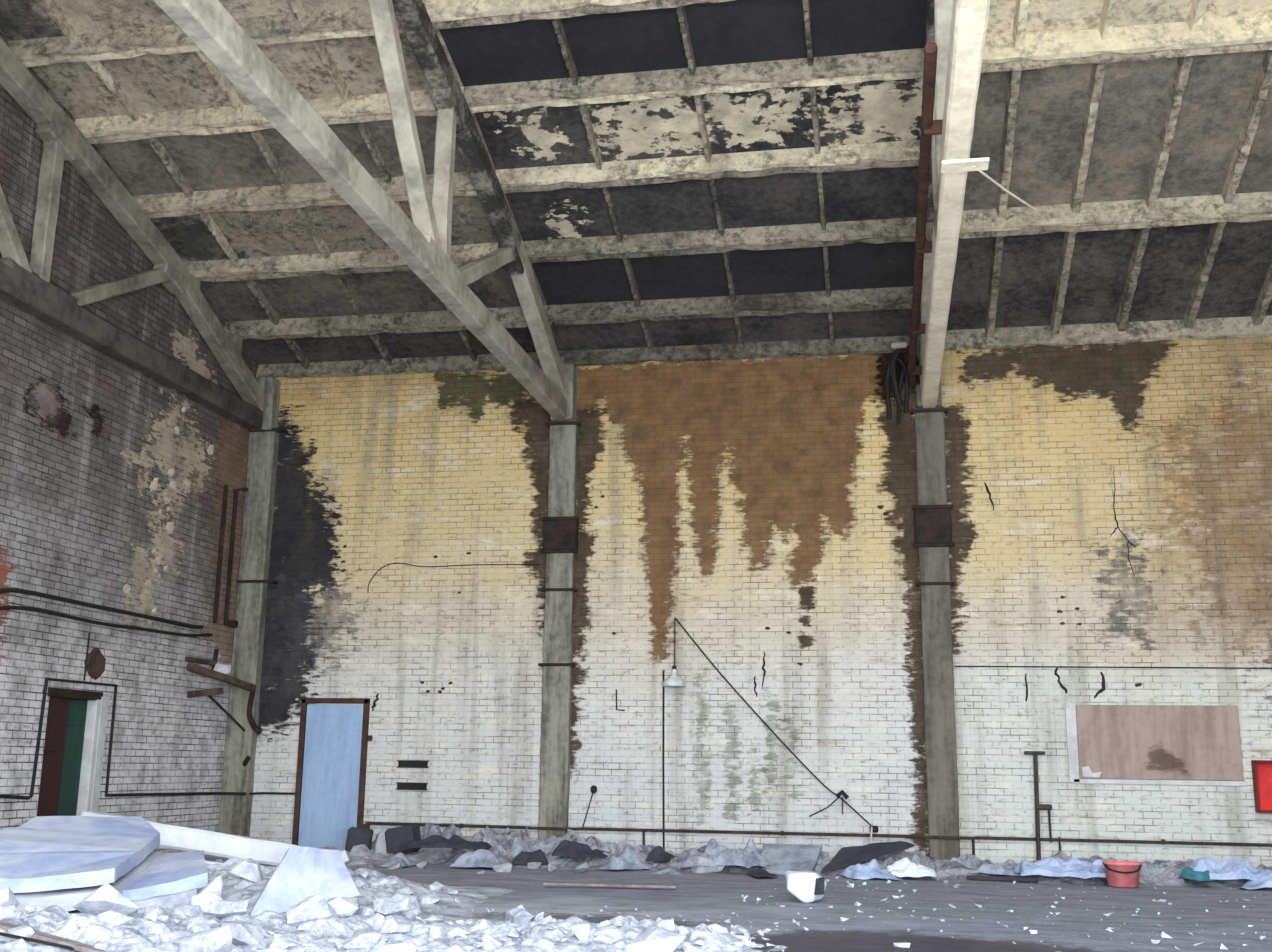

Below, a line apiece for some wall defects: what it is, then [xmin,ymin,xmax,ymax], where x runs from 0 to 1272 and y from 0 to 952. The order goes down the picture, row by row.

spalling [483,106,573,163]
spalling [577,78,923,162]
leakage [956,340,1178,431]
flaking render [0,548,17,640]
peeling [119,387,249,664]
leakage [433,369,552,636]
leakage [570,352,929,857]
leakage [942,403,978,655]
leakage [1096,544,1150,582]
leakage [1109,601,1154,649]